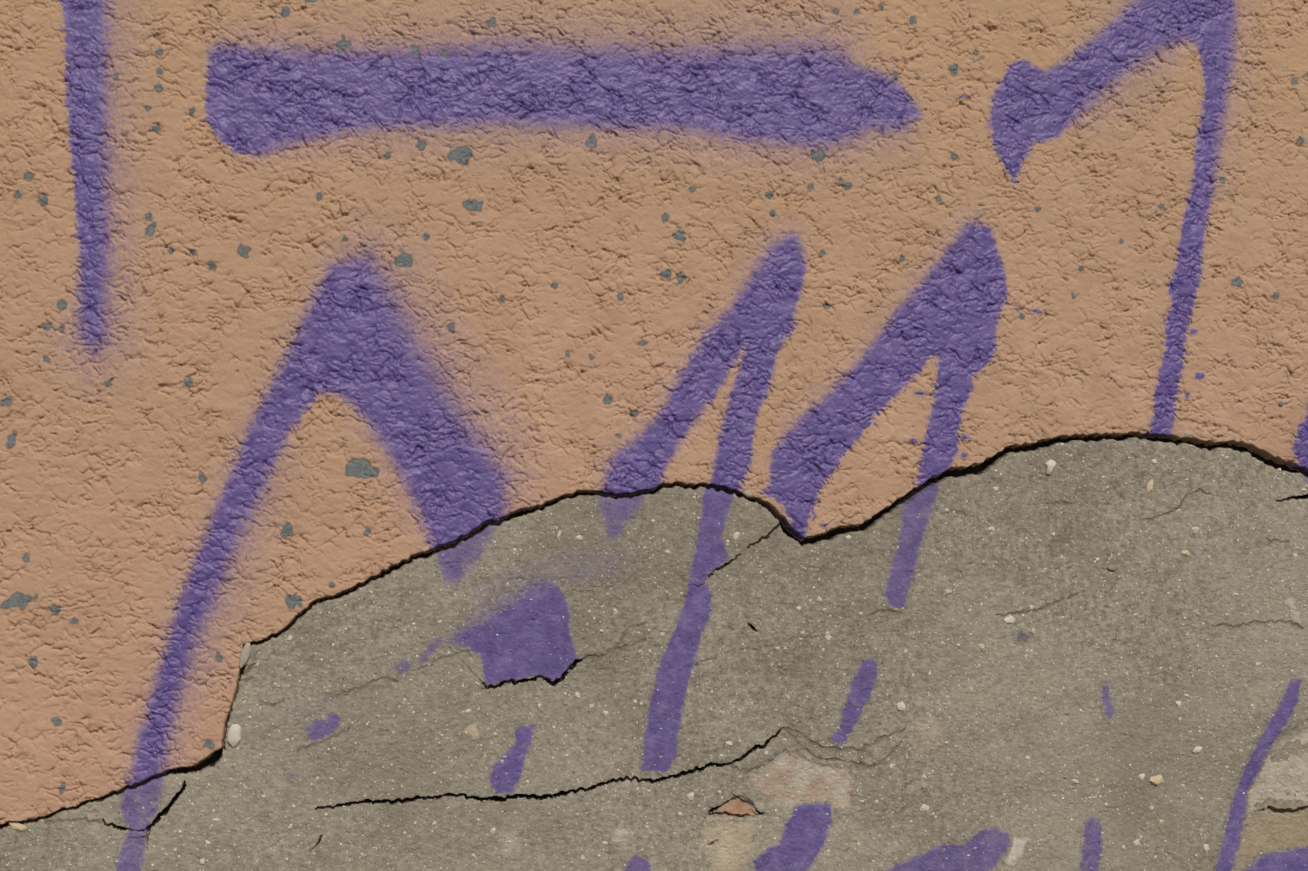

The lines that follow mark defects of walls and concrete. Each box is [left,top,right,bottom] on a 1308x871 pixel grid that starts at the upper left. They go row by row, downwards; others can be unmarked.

peeling [6,430,17,448]
crack [648,435,1308,583]
peeling [0,592,78,623]
crack [0,493,593,844]
crack [336,621,647,695]
spalling [144,437,1308,871]
spalling [0,782,126,871]
crack [315,727,913,844]